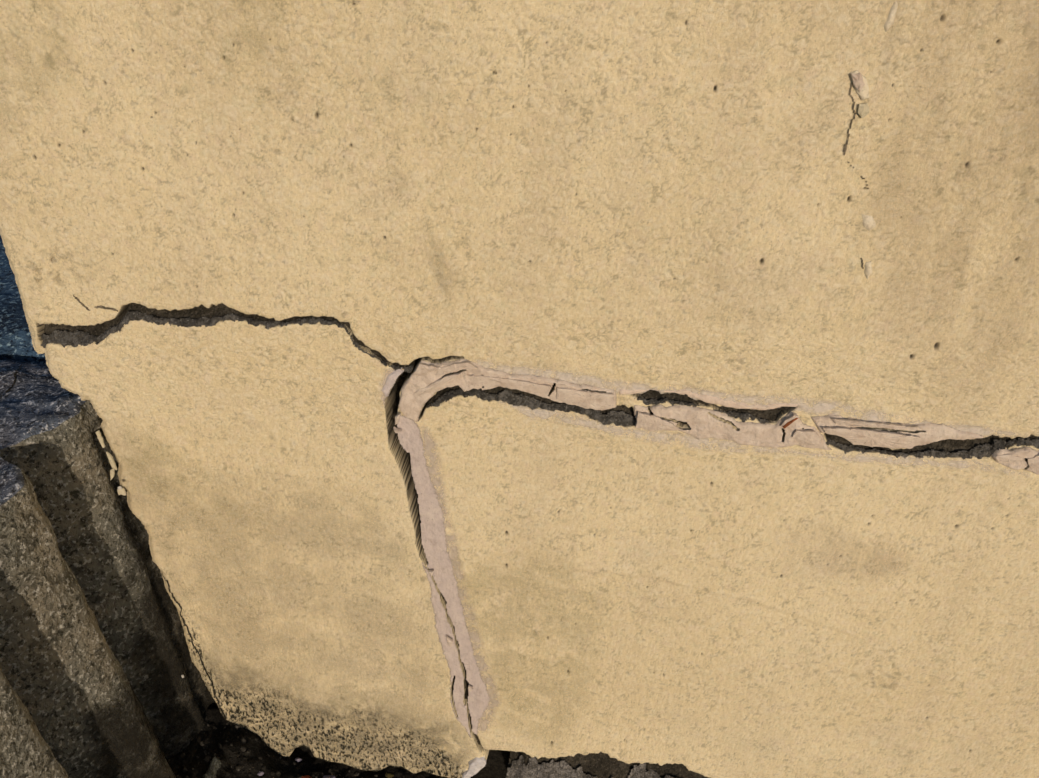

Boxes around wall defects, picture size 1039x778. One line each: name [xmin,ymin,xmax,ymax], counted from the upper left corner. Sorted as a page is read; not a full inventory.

crack [41,295,1039,462]
peeling [382,358,1013,467]
peeling [991,447,1039,475]
crack [160,570,226,720]
crack [441,593,481,745]
crack [506,751,709,778]